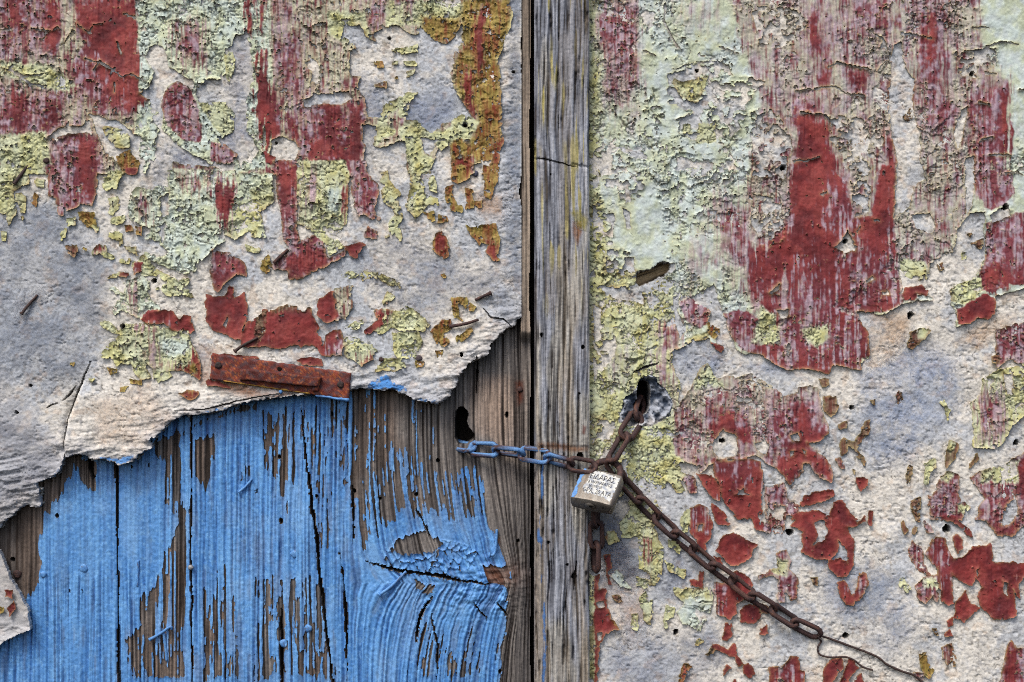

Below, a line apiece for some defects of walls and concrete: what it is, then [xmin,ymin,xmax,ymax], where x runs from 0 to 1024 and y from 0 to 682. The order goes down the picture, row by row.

peeling [0,0,513,400]
crack [536,158,578,168]
peeling [589,0,1024,682]
peeling [195,433,215,492]
peeling [263,406,295,513]
peeling [340,388,461,543]
peeling [127,428,187,679]
crack [301,410,508,682]
peeling [390,530,443,558]
peeling [203,564,239,681]
peeling [255,575,327,681]
peeling [483,557,531,682]